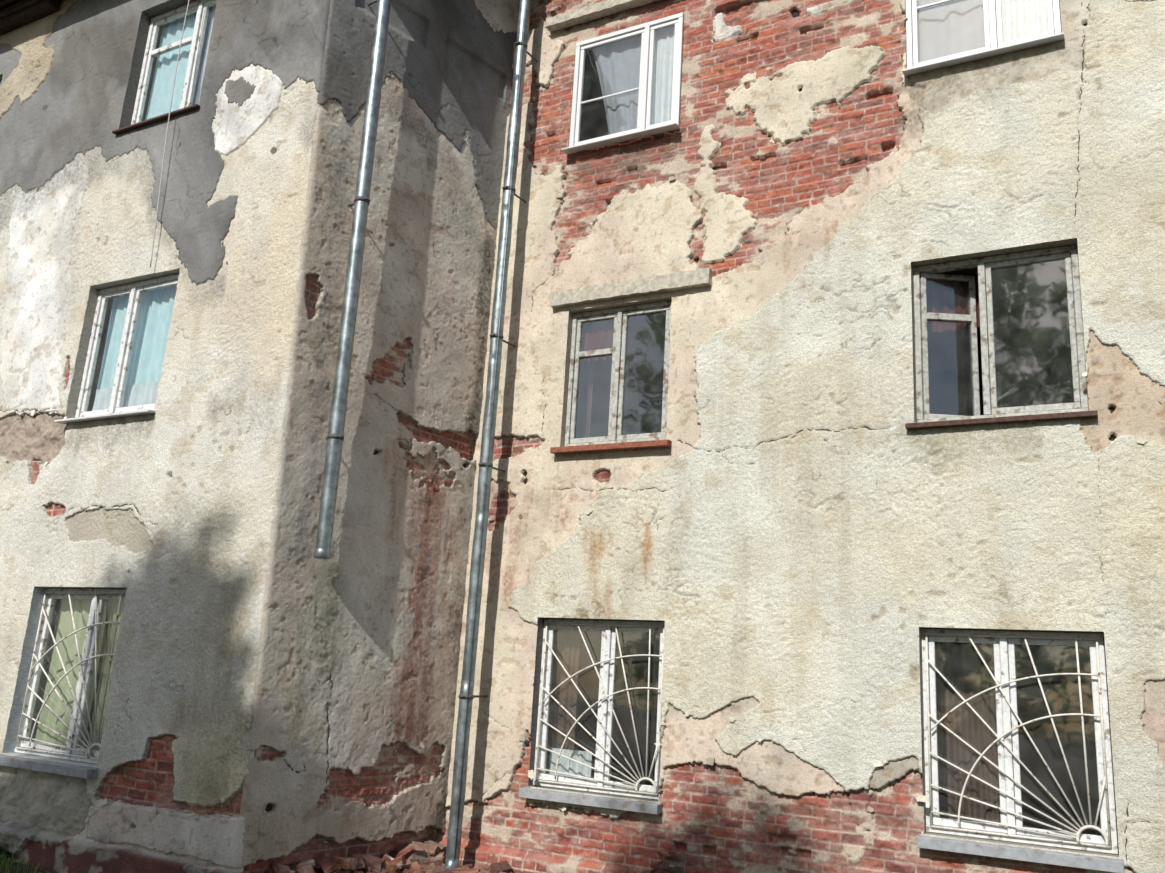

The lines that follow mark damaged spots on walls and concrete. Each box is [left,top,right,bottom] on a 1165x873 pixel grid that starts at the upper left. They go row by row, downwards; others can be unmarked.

peeling [0,0,82,119]
peeling [212,67,283,156]
crack [1075,3,1087,215]
peeling [0,156,89,484]
peeling [46,503,153,553]
peeling [85,95,512,873]
peeling [459,0,1135,873]
peeling [1080,330,1165,453]
peeling [1140,679,1165,763]
peeling [0,820,41,854]